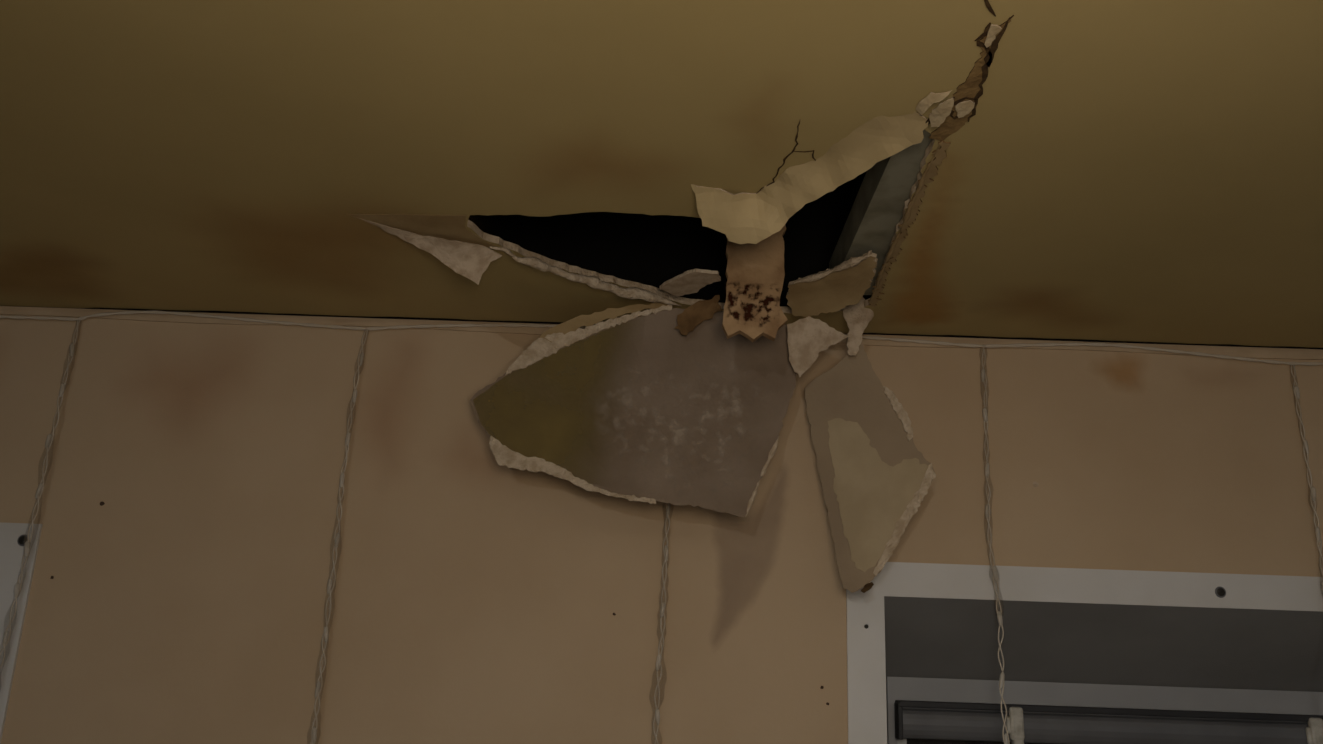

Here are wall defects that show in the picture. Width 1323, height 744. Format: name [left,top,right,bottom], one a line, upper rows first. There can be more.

crack [916,0,1014,141]
crack [756,121,816,194]
peeling [691,111,928,244]
peeling [828,418,928,573]